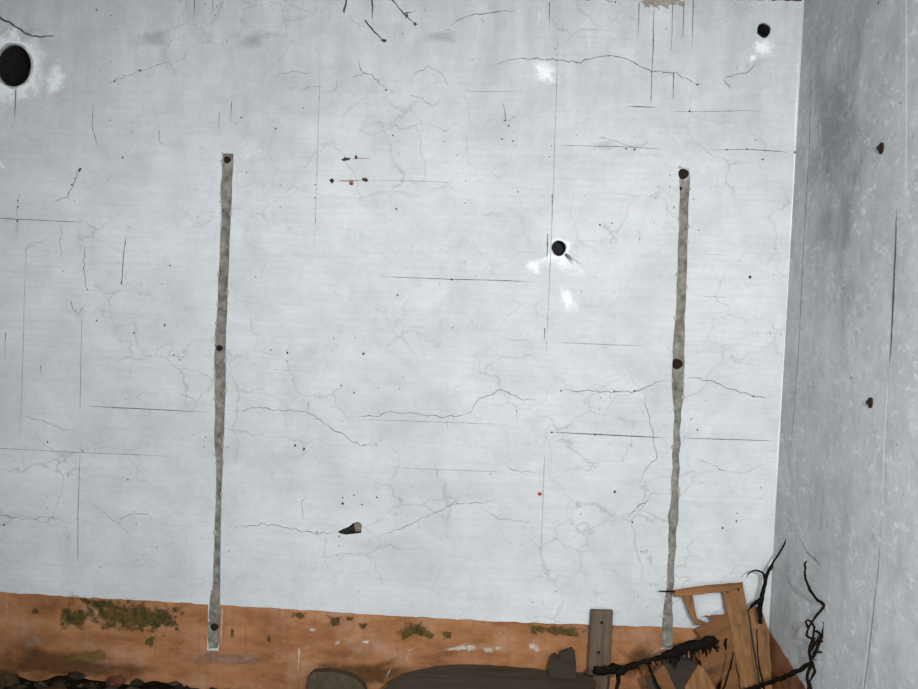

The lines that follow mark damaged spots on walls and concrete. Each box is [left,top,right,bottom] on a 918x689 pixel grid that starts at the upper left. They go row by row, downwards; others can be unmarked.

crack [511,55,698,86]
crack [554,120,656,152]
crack [1,170,80,296]
crack [71,246,98,337]
crack [399,275,507,283]
crack [80,373,195,412]
crack [243,389,528,446]
crack [551,381,659,476]
crack [0,394,154,521]
crack [692,438,765,473]
crack [244,497,327,535]